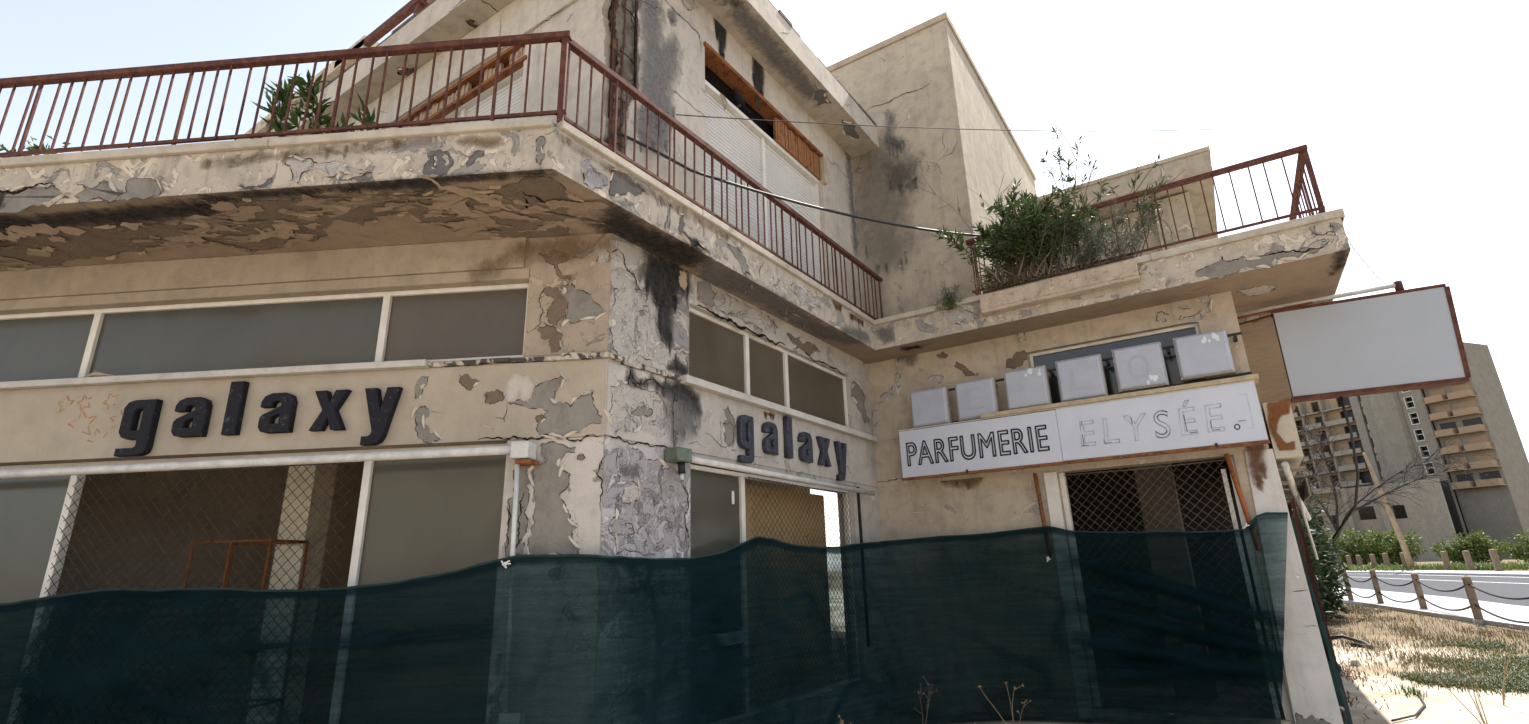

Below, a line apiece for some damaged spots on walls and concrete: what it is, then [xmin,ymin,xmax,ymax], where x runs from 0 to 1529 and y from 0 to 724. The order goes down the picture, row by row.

damp [636,0,678,152]
damp [714,0,816,111]
crack [0,182,53,195]
peeling [0,0,688,369]
peeling [665,202,708,254]
damp [482,201,920,446]
peeling [678,242,821,355]
damp [886,115,904,156]
peeling [1156,239,1334,323]
peeling [411,376,443,444]
peeling [459,370,691,558]
peeling [723,407,737,447]